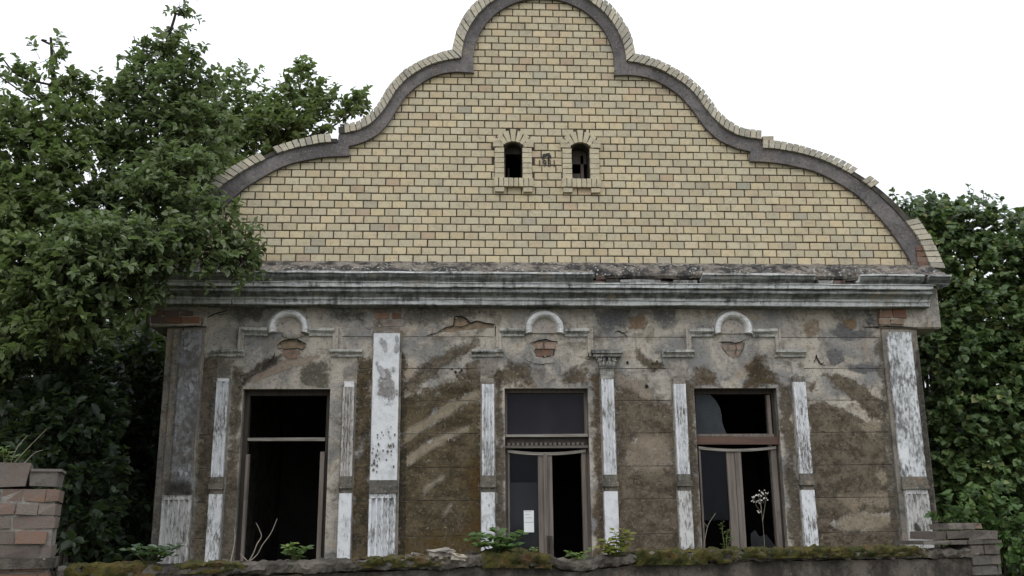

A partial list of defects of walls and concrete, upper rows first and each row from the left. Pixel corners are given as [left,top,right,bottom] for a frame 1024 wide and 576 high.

spalling [440,317,494,332]
spalling [876,309,907,325]
peeling [249,340,319,383]
water stain [300,362,328,388]
peeling [376,362,398,400]
water stain [398,337,534,555]
water stain [808,310,901,547]